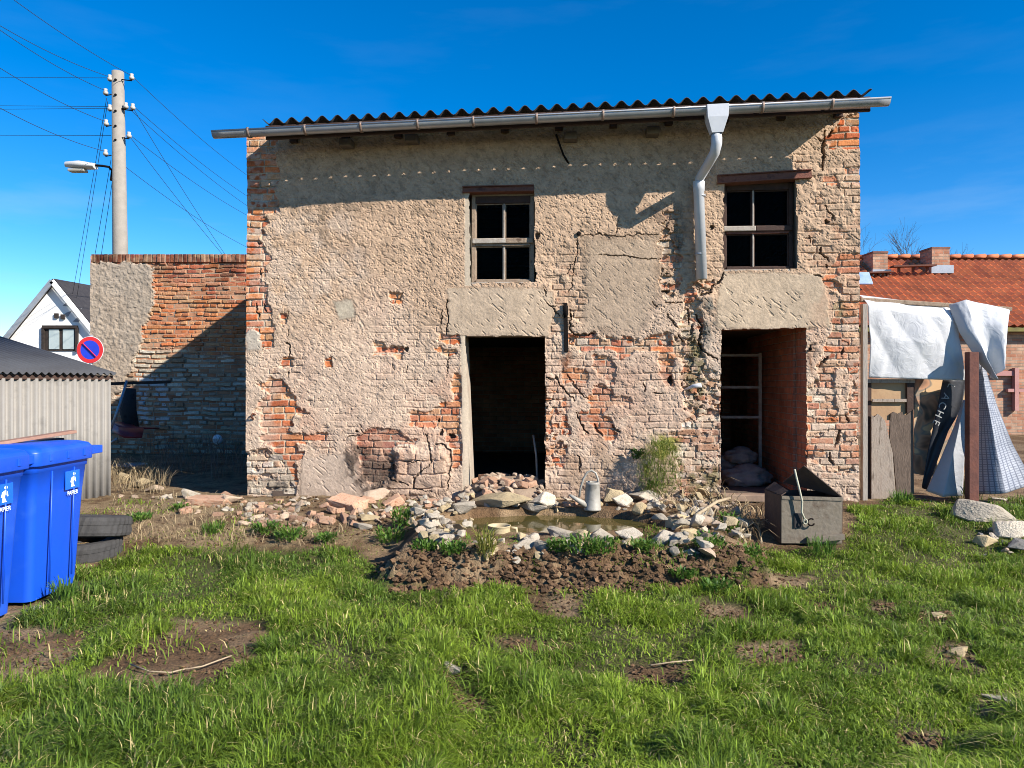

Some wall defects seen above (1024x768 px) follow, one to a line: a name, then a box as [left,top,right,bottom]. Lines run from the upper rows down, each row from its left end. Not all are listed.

flaking render [822,167,860,186]
flaking render [824,113,860,151]
flaking render [113,137,288,359]
flaking render [373,340,409,360]
crack [544,224,659,342]
flaking render [544,211,722,501]
crack [652,273,724,360]
flaking render [805,253,860,476]
flaking render [246,357,328,497]
flaking render [355,372,464,486]
crack [394,434,452,493]